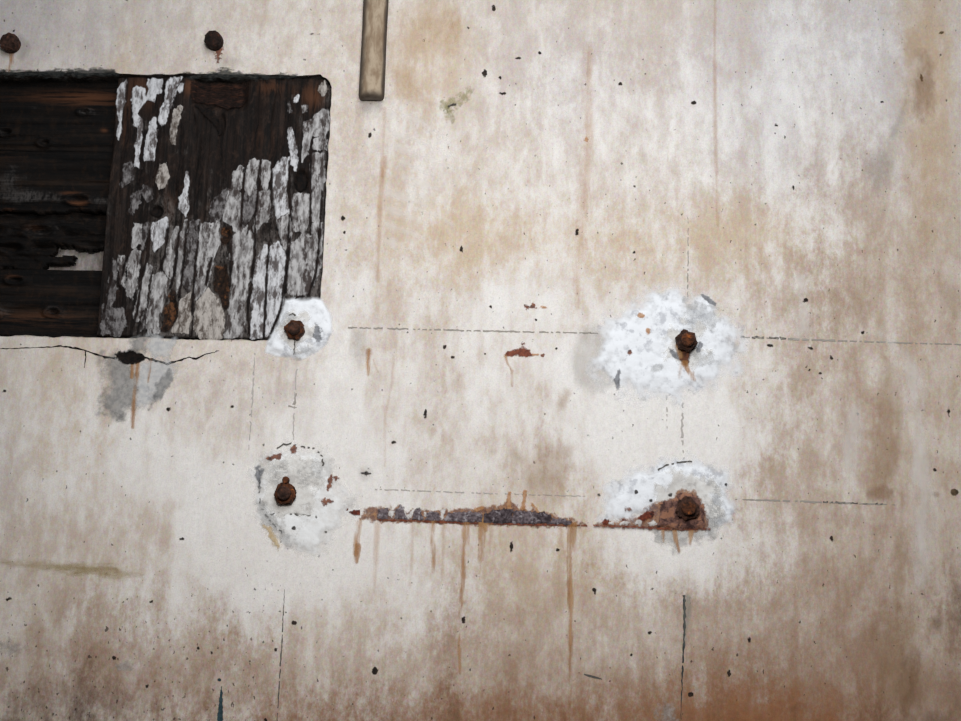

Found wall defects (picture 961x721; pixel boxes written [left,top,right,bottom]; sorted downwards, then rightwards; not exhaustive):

peeling [100,76,330,427]
crack [0,345,117,368]
crack [145,350,219,365]
corrosion [505,343,544,360]
corrosion [676,345,691,372]
corrosion [346,489,711,552]